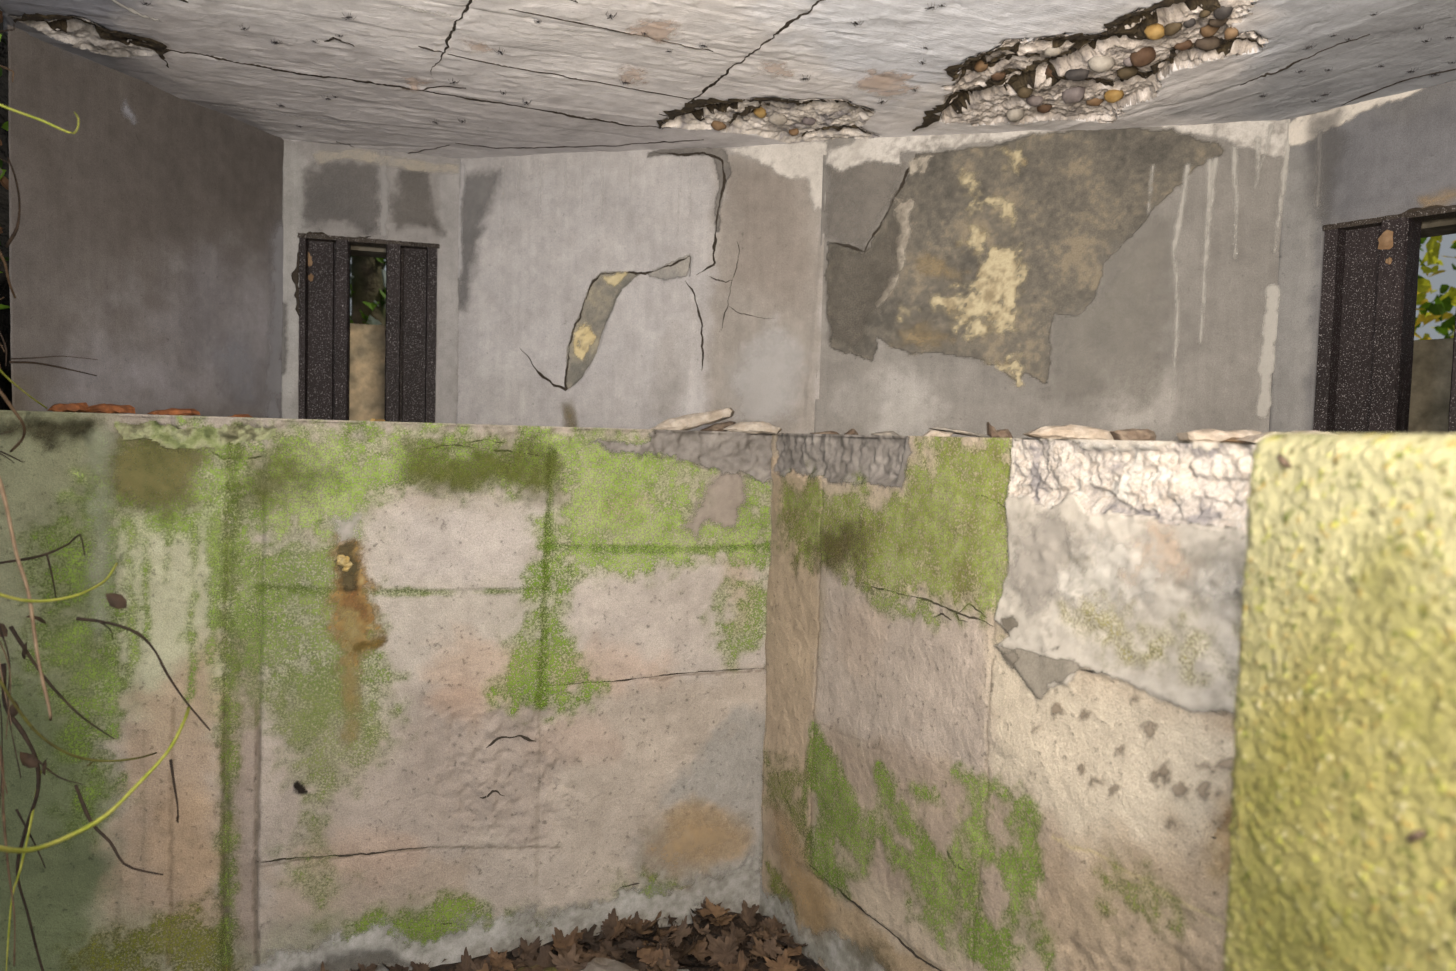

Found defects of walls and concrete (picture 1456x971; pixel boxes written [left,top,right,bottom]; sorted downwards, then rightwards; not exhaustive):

spalling [9,13,171,59]
crack [159,0,823,154]
spalling [657,97,880,144]
spalling [912,0,1269,131]
crack [1240,34,1370,86]
crack [1341,69,1456,106]
water stain [522,89,1421,427]
water stain [0,420,204,628]
water stain [406,445,561,493]
water stain [685,472,746,534]
spalling [1008,439,1256,533]
corrosion [327,535,387,742]